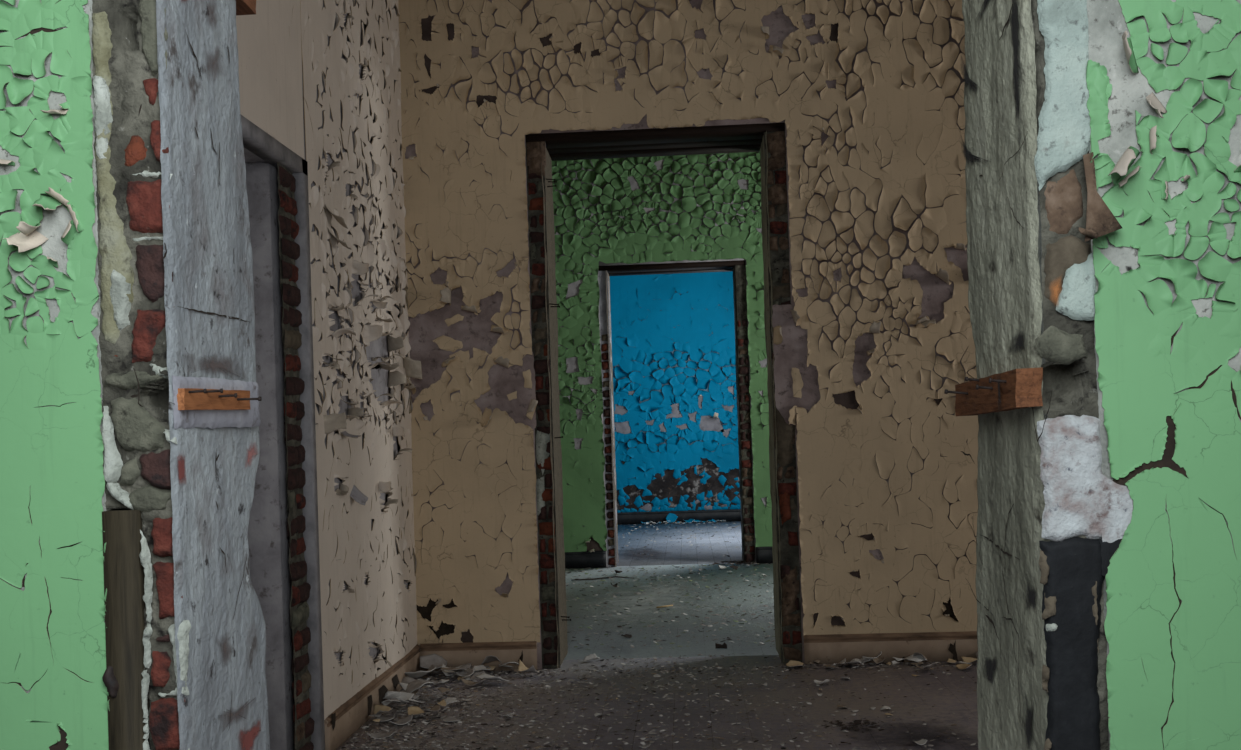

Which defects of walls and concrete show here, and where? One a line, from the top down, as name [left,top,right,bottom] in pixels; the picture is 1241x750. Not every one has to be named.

peeling [419,16,455,94]
peeling [760,7,839,57]
peeling [1228,96,1241,173]
flaking render [4,0,191,750]
flaking render [323,136,560,668]
flaking render [565,271,636,567]
flaking render [641,131,978,670]
flaking render [1031,0,1177,750]
crack [1112,416,1188,486]
crack [1187,365,1241,419]
crack [8,498,89,688]
crack [1144,545,1182,750]